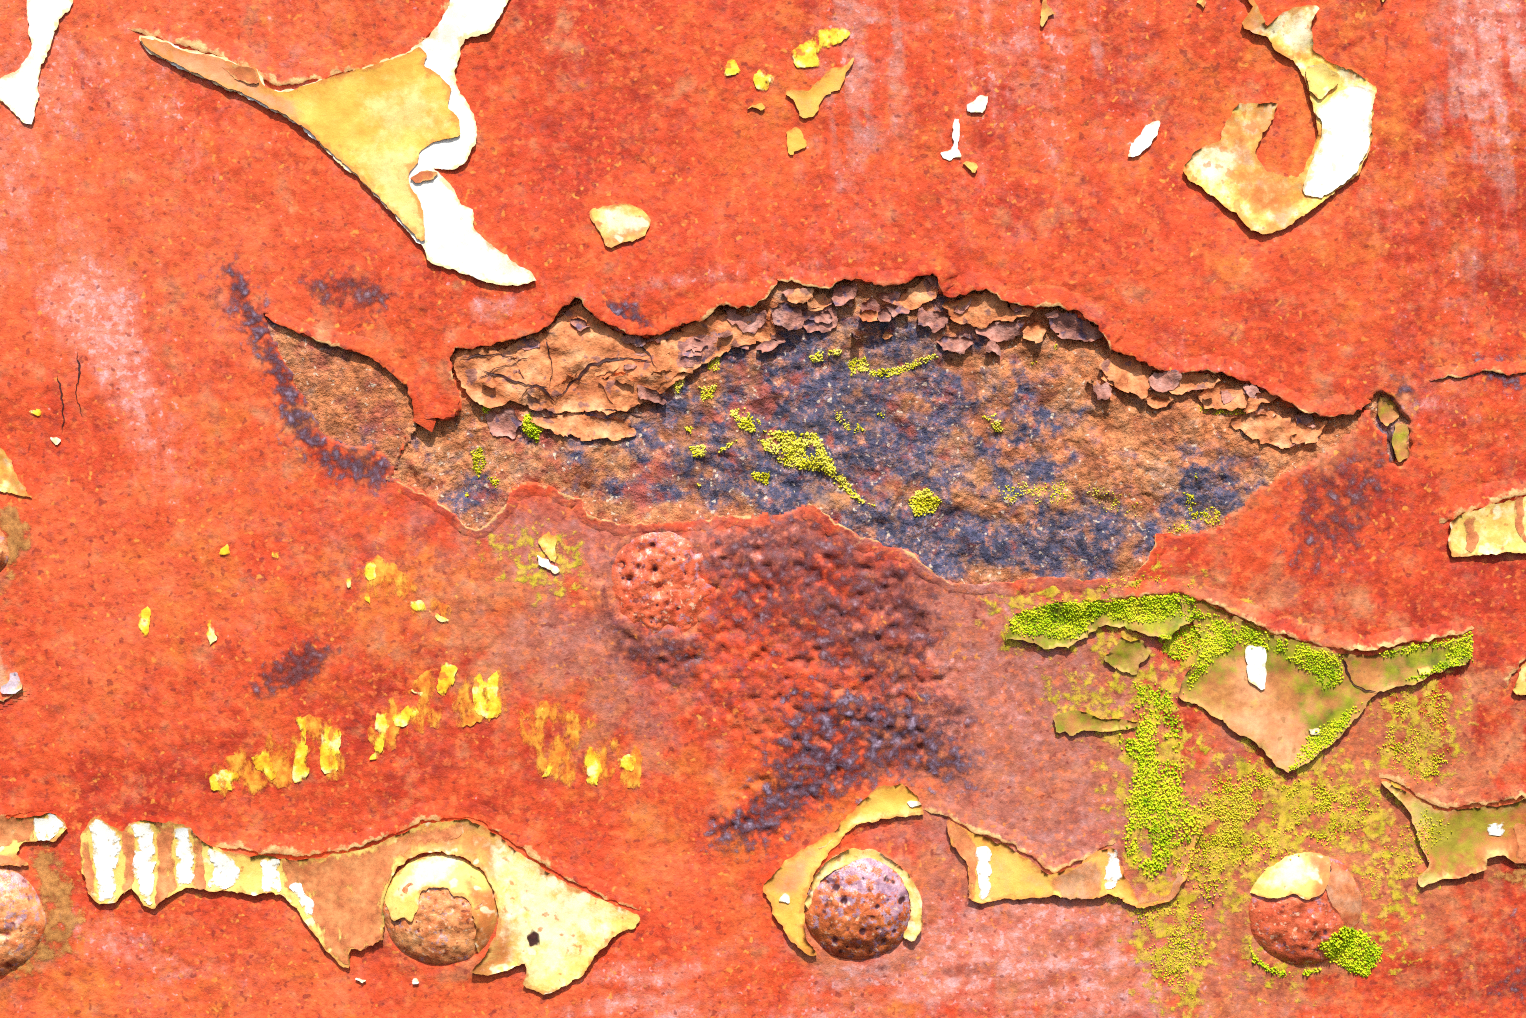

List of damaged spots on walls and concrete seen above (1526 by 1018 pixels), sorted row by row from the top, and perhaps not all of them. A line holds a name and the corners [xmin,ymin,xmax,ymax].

peeling [0,0,73,124]
peeling [128,0,536,286]
peeling [721,28,854,155]
peeling [1183,0,1377,234]
crack [1429,358,1526,381]
rust [1475,352,1524,390]
rust [226,253,1413,852]
peeling [1438,474,1526,557]
peeling [0,796,644,995]
peeling [763,783,1203,956]
peeling [1377,764,1526,887]
rust [1489,939,1526,999]